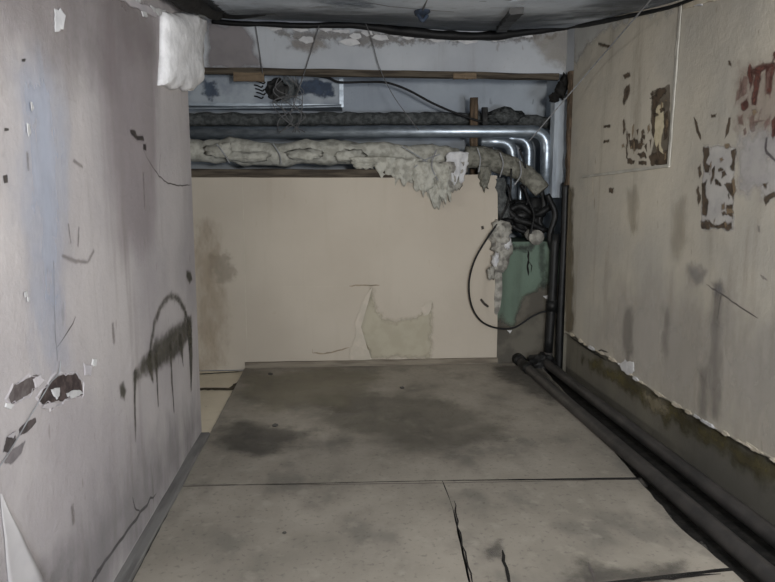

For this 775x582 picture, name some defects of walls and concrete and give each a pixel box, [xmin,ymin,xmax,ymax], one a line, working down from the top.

peeling [265,27,478,49]
spalling [4,359,97,412]
spalling [3,418,36,464]
leakage [581,358,775,479]